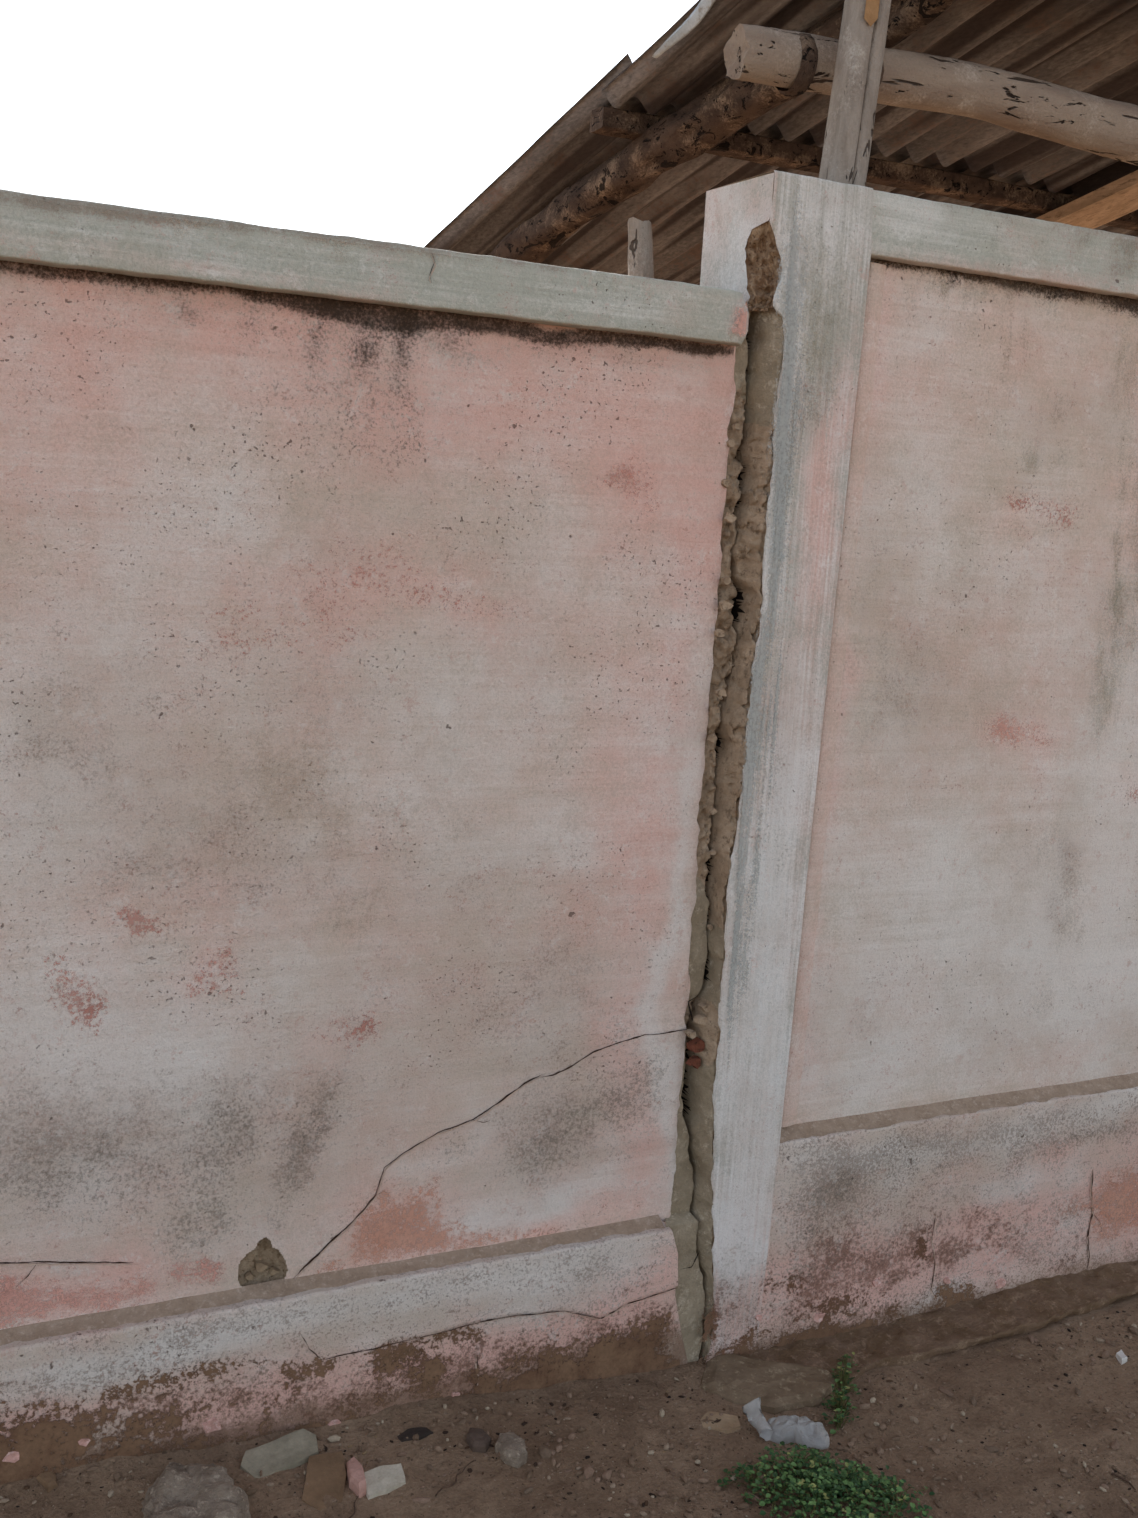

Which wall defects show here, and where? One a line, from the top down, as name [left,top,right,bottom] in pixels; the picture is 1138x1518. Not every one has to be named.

leakage [0,260,734,375]
crack [733,450,746,514]
crack [731,583,745,660]
crack [714,702,722,759]
crack [295,842,713,1279]
leakage [786,1206,1026,1322]
leakage [84,1303,669,1442]